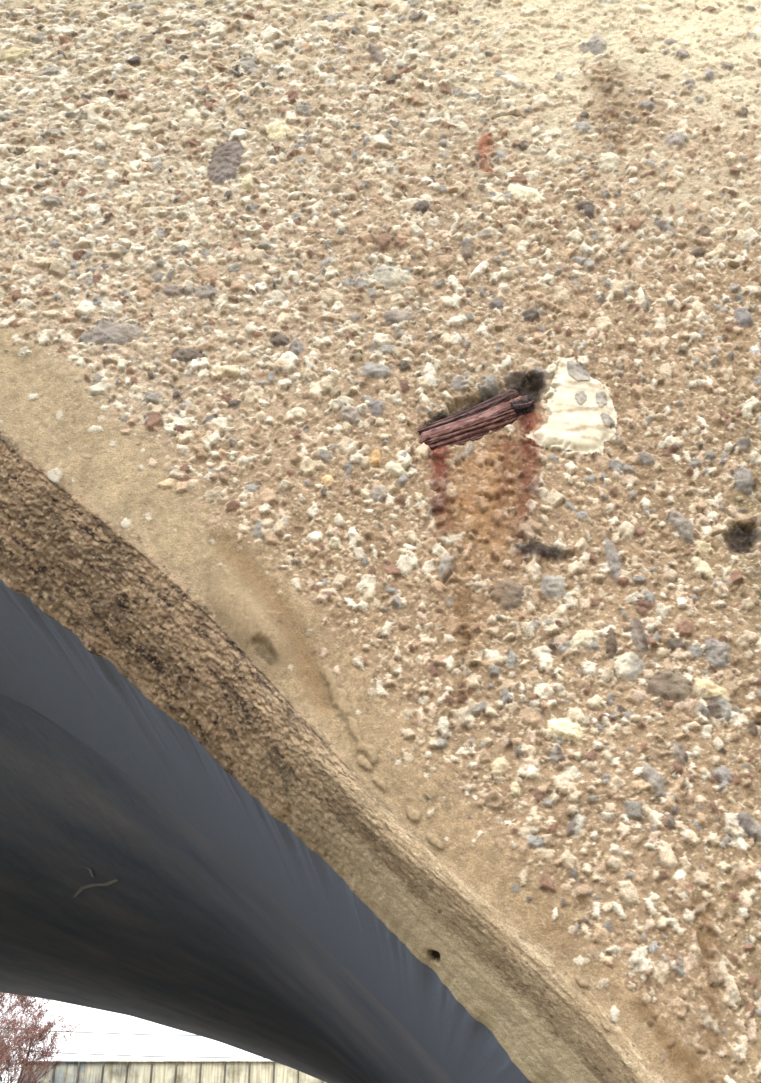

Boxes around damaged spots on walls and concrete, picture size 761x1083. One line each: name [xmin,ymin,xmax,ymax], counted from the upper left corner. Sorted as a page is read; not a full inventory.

spalling [417,372,544,450]